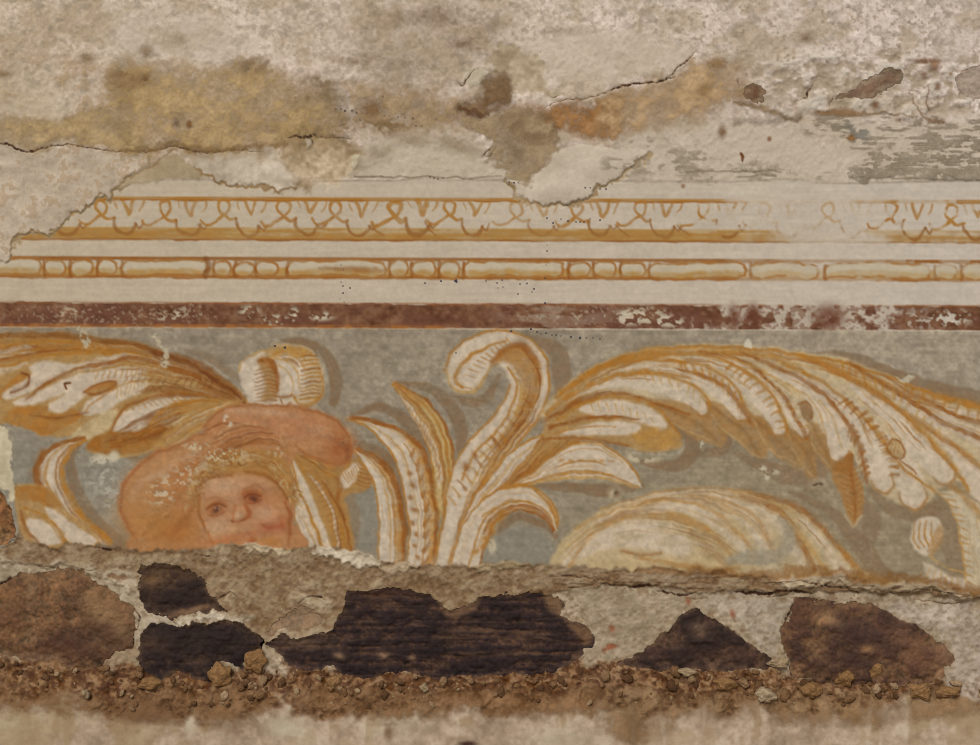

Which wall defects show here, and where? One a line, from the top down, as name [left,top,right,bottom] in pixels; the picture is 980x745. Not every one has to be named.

crack [549,54,693,106]
crack [0,142,258,154]
water stain [0,62,560,185]
crack [290,134,349,142]
peeling [807,115,980,183]
flaking render [0,125,392,264]
peeling [572,307,685,328]
flaking render [15,531,980,645]
crack [554,575,859,622]
water stain [0,687,270,722]
water stain [383,684,725,744]
water stain [768,692,883,727]